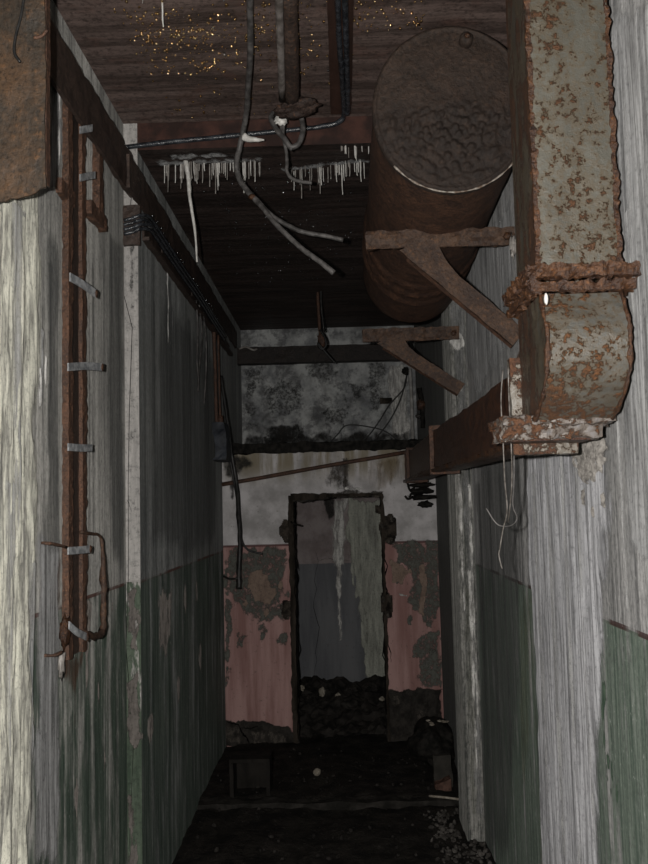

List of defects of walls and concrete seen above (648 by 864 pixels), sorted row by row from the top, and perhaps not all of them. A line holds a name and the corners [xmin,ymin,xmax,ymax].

leakage [159,153,261,166]
leakage [246,368,304,442]
leakage [323,362,410,440]
corrosion [403,354,579,483]
peeling [224,519,292,687]
leakage [330,459,385,677]
peeling [293,487,442,742]